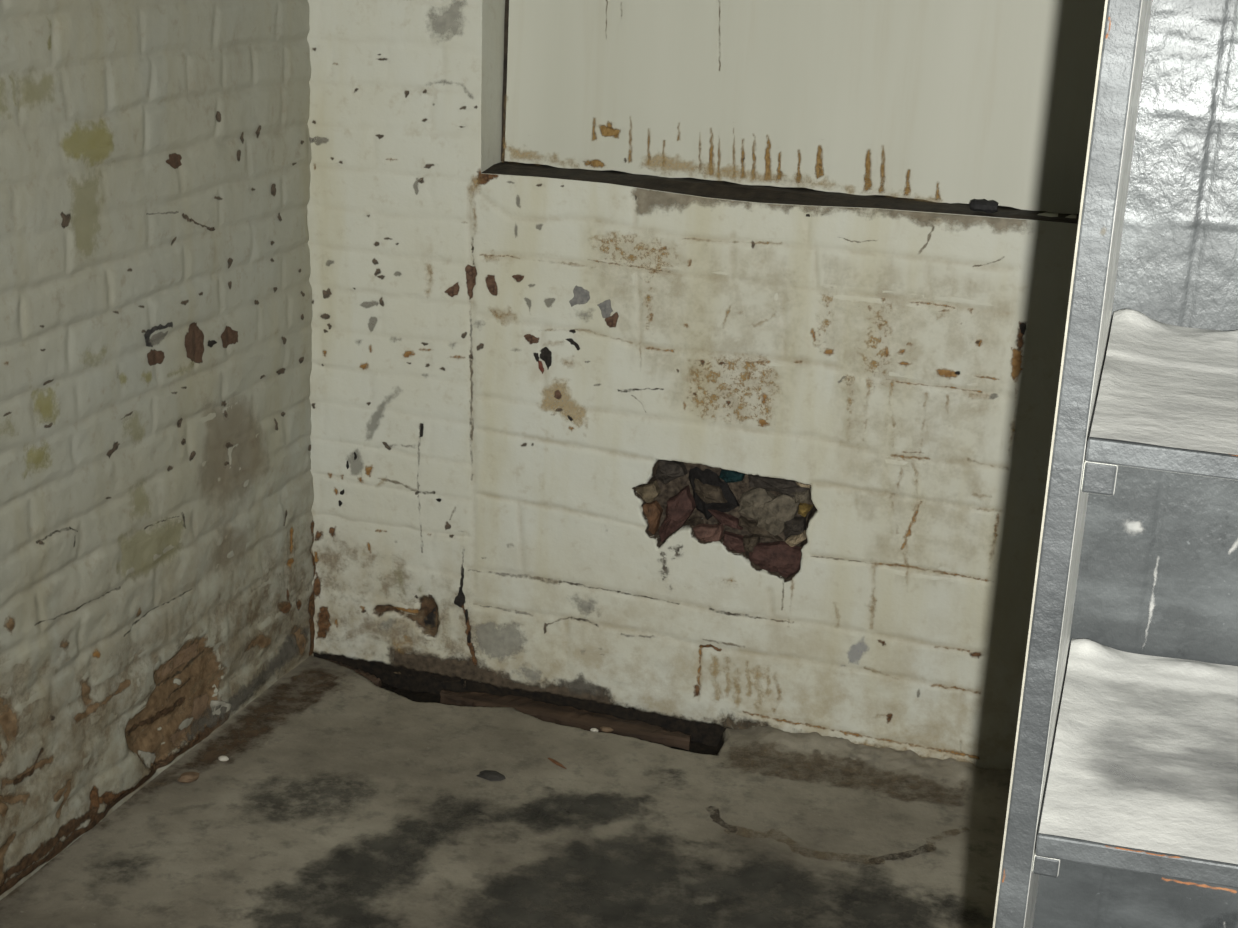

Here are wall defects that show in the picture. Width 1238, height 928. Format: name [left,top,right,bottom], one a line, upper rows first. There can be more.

rust [592,118,632,162]
rust [646,130,782,180]
rust [796,146,824,185]
rust [847,150,885,193]
rust [677,359,773,427]
spalling [632,460,817,582]
spalling [362,595,440,637]
spalling [125,637,232,770]
leakage [712,714,771,729]
peeling [0,697,53,817]
leakage [254,777,363,821]
leakage [256,788,990,928]